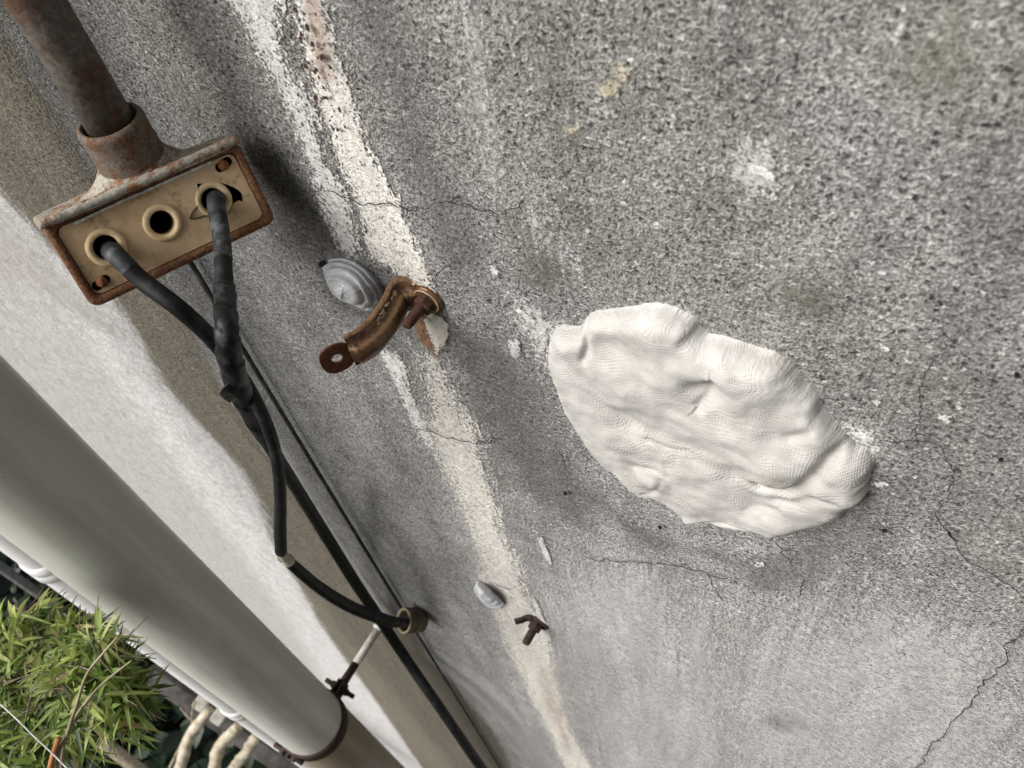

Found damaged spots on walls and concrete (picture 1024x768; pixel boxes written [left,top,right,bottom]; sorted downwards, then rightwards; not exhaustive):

crack [327,190,525,293]
corrosion [413,312,443,356]
crack [882,318,1024,599]
crack [586,557,736,601]
crack [775,543,806,600]
crack [916,629,1024,768]